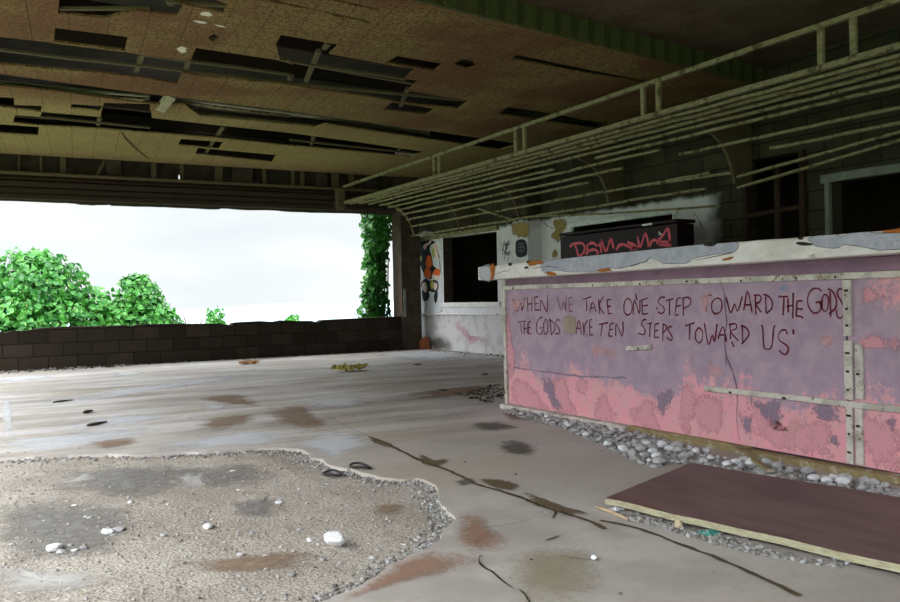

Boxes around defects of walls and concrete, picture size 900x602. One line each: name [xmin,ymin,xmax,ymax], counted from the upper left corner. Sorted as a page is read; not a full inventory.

peeling [524,219,739,273]
peeling [796,231,900,251]
crack [722,287,740,440]
peeling [553,375,588,415]
peeling [630,399,660,430]
peeling [748,407,834,459]
spalling [0,449,455,602]
corrosion [463,519,494,546]
crack [325,415,802,602]